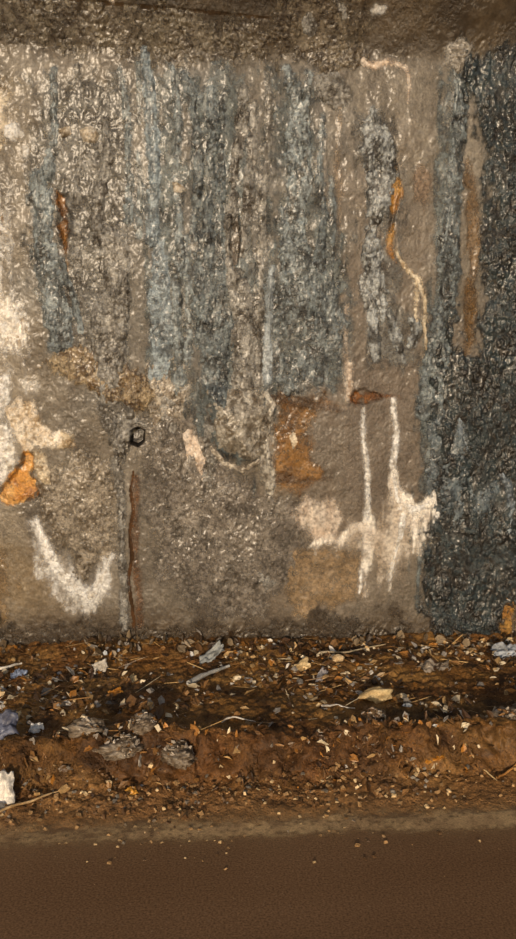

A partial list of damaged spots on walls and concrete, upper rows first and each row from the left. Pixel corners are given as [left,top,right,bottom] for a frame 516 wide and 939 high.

water stain [0,0,516,645]
spalling [0,449,51,505]
corrosion [271,391,341,495]
spalling [350,391,389,405]
crack [110,458,143,634]